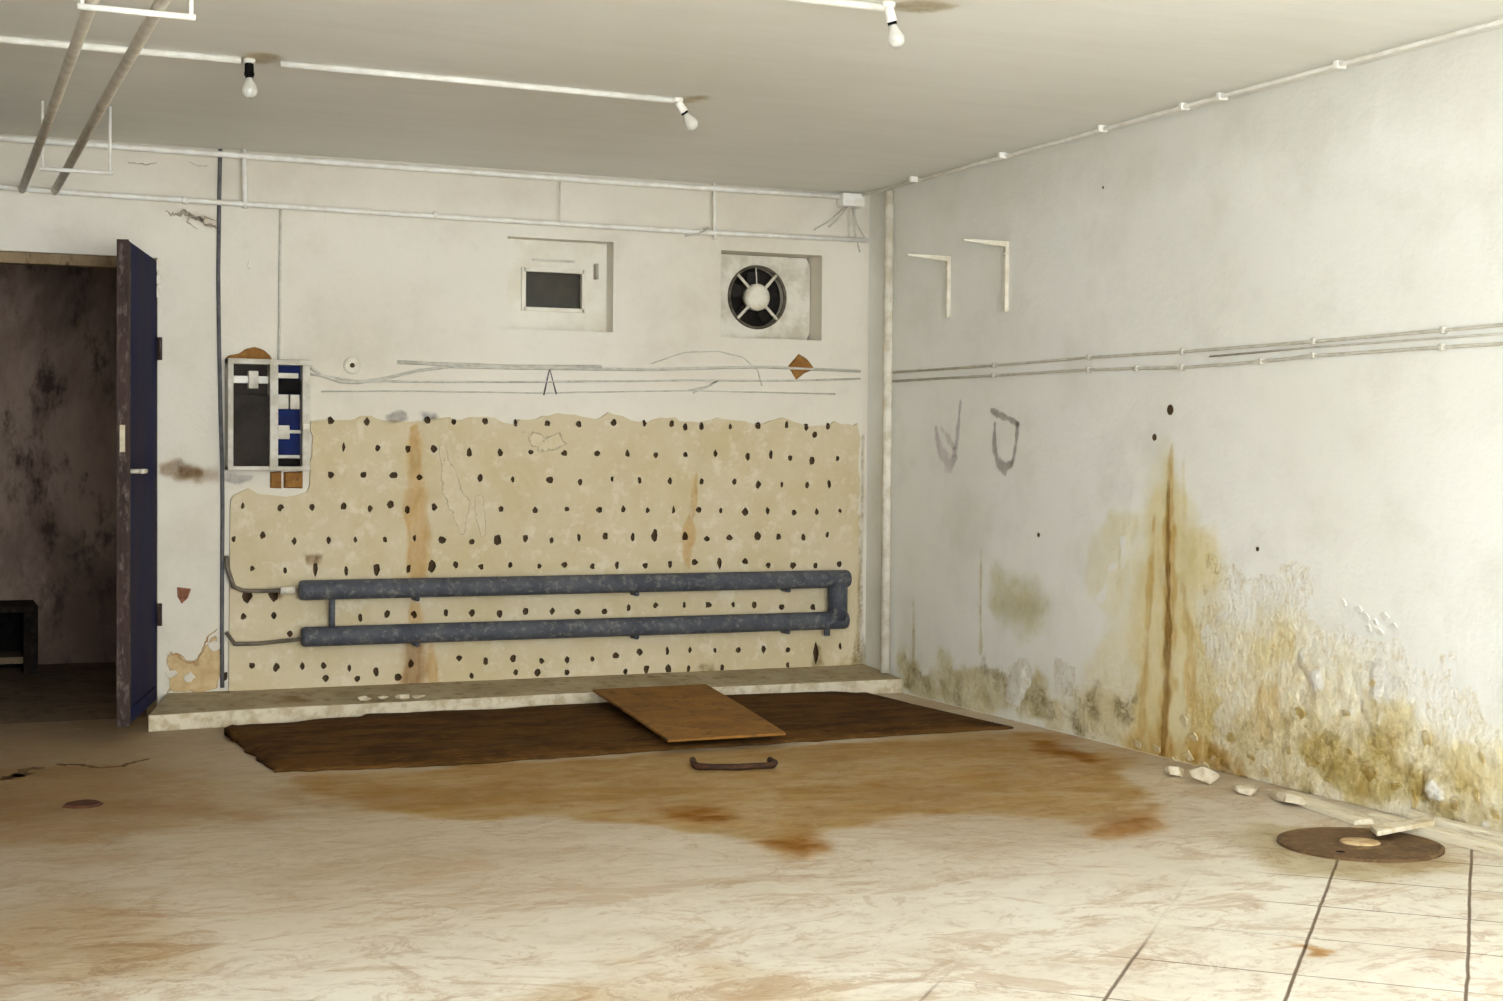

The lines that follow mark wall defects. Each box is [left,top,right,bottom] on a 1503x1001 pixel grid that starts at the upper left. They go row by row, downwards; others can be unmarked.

water stain [1070,466,1155,659]
peeling [165,629,227,693]
spalling [347,659,414,682]
spalling [613,647,692,674]
water stain [1003,657,1034,713]
peeling [1182,554,1503,832]
water stain [1134,715,1219,769]